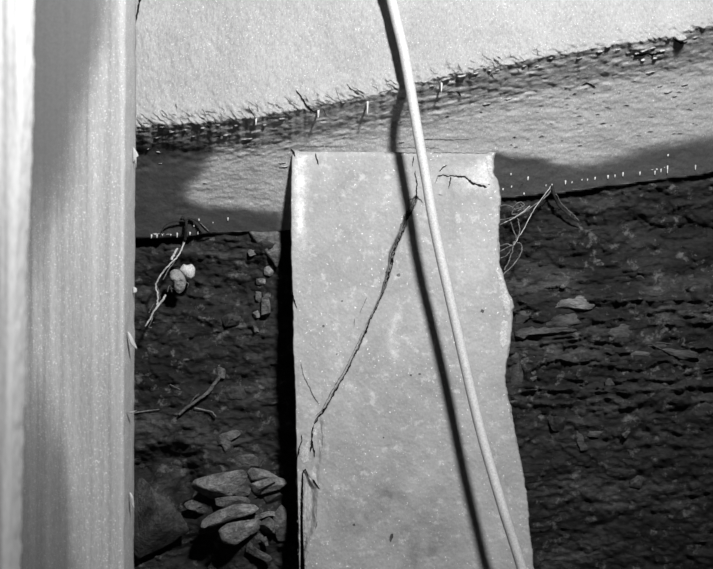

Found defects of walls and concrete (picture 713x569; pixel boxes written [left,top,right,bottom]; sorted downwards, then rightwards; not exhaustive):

crack [296,139,490,569]